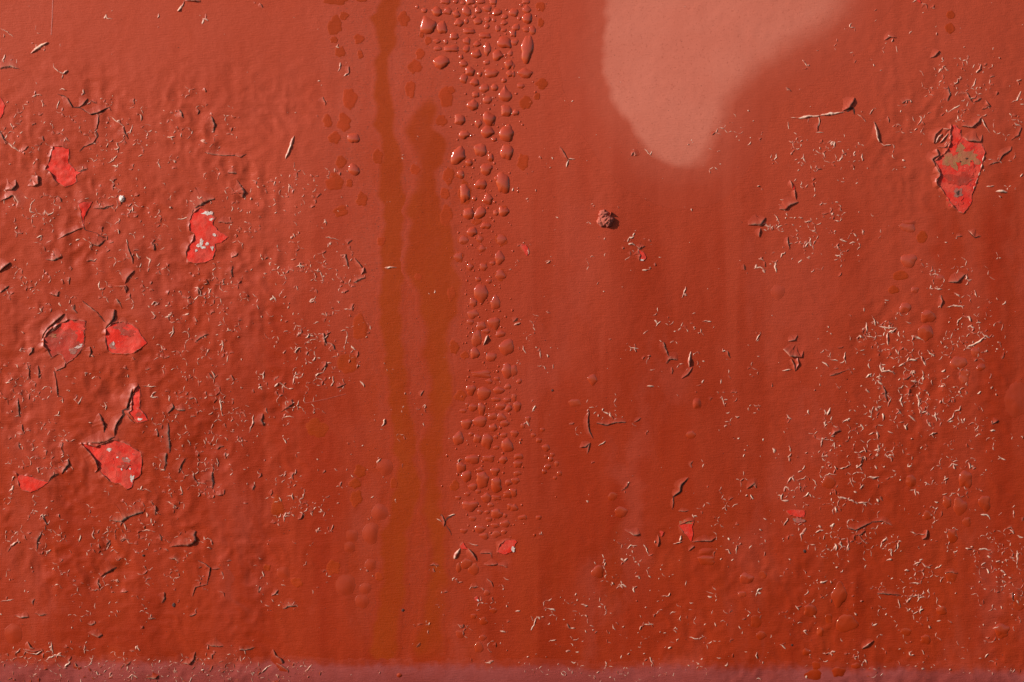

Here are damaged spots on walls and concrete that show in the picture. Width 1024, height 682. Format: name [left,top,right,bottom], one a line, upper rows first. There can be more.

peeling [861,46,1024,215]
peeling [0,82,381,682]
leakage [51,0,508,662]
peeling [621,230,661,271]
peeling [625,308,714,379]
peeling [674,257,1024,679]
peeling [436,527,766,682]